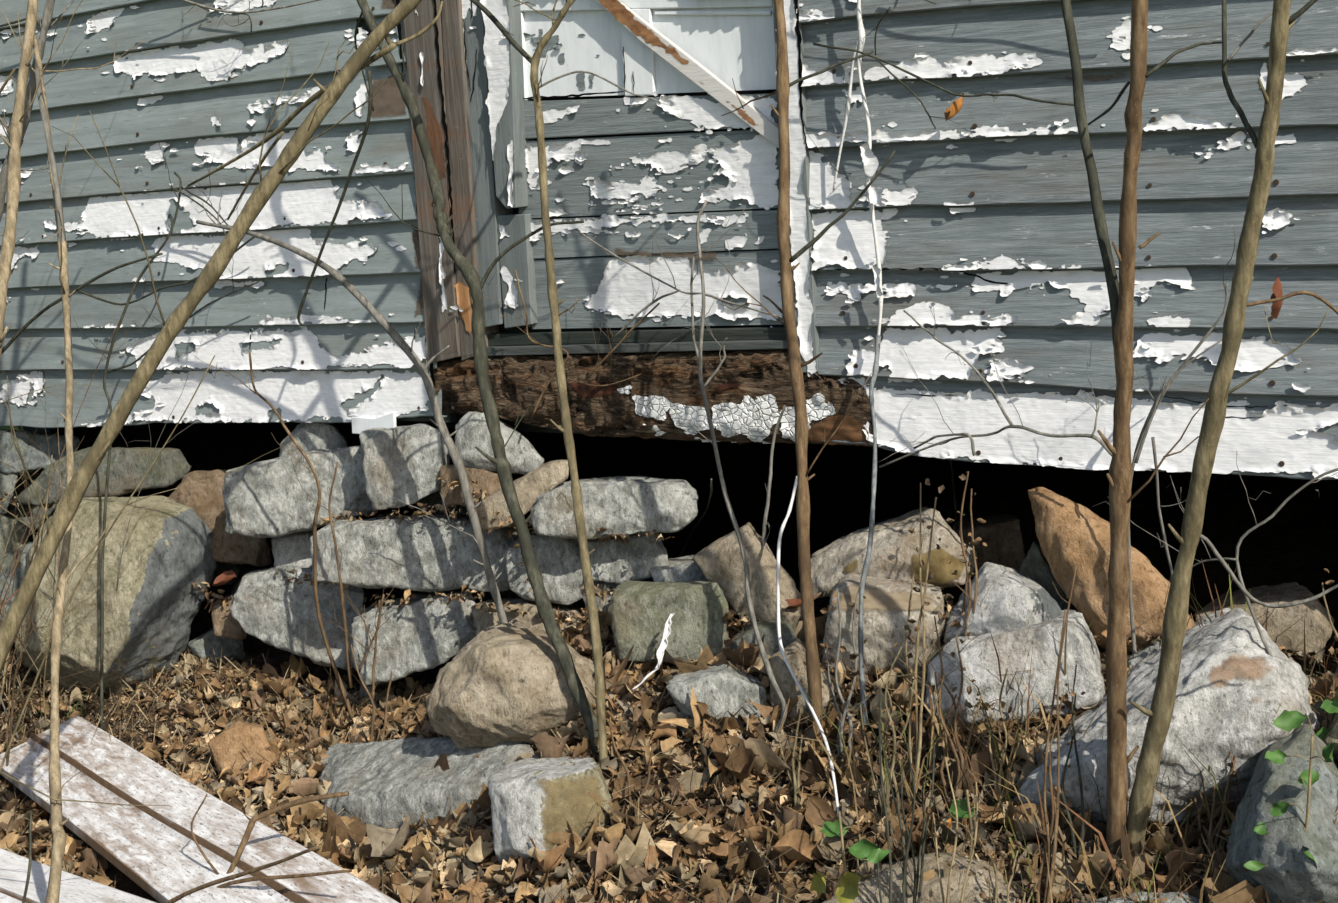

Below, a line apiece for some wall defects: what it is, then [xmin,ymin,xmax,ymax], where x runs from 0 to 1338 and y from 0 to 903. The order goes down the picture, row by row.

peeling [101,38,289,106]
peeling [1106,16,1131,60]
peeling [1282,47,1338,99]
peeling [1143,109,1252,159]
peeling [11,78,409,289]
peeling [462,0,1119,470]
peeling [1262,208,1301,234]
peeling [1133,264,1223,365]
peeling [125,307,431,424]
crack [617,385,835,444]
peeling [1130,388,1206,472]
peeling [1212,336,1338,479]